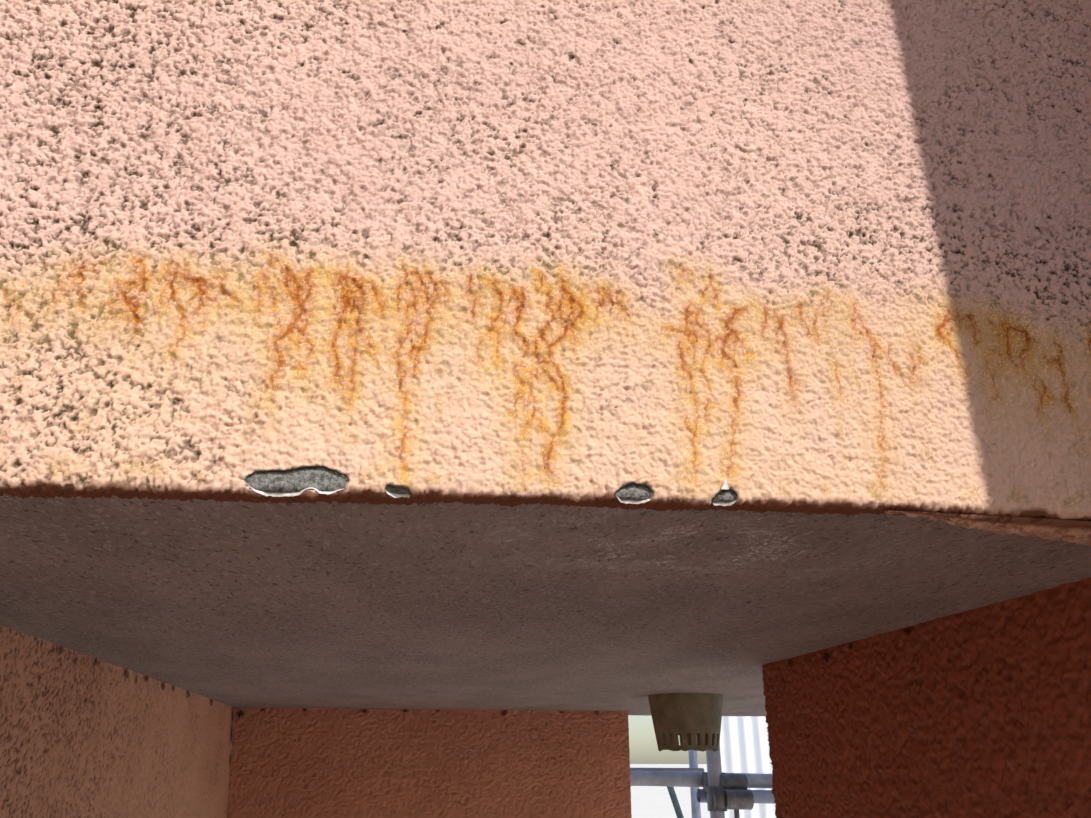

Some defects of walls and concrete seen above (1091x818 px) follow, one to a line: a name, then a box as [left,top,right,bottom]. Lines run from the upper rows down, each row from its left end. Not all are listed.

corrosion [254,256,452,483]
corrosion [469,268,629,481]
corrosion [663,271,755,462]
corrosion [936,310,1075,413]
spalling [244,466,349,497]
spalling [385,484,411,498]
spalling [614,482,653,504]
spalling [712,478,737,506]